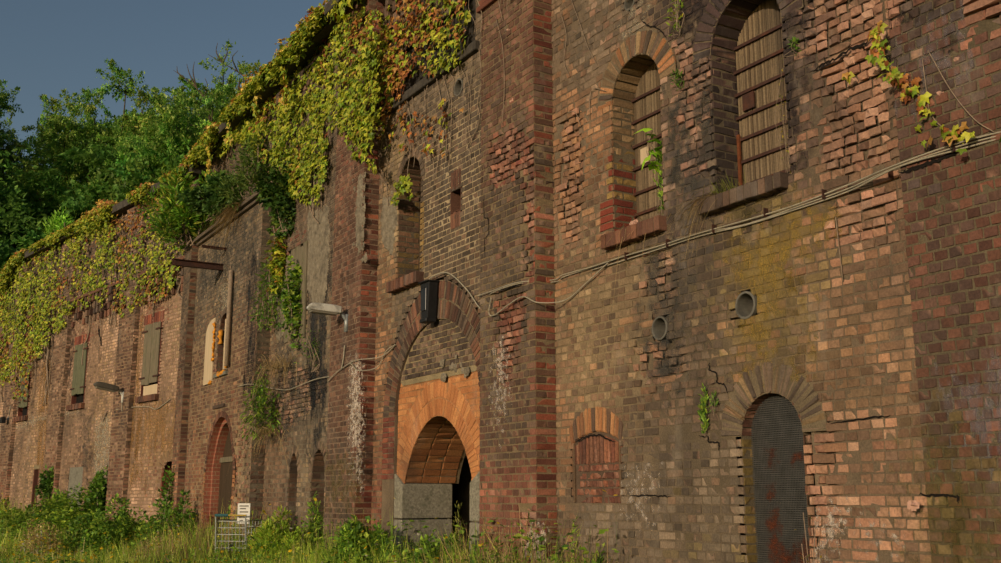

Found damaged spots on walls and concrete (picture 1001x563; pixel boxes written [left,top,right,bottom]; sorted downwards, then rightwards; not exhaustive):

damp [348,361,365,488]